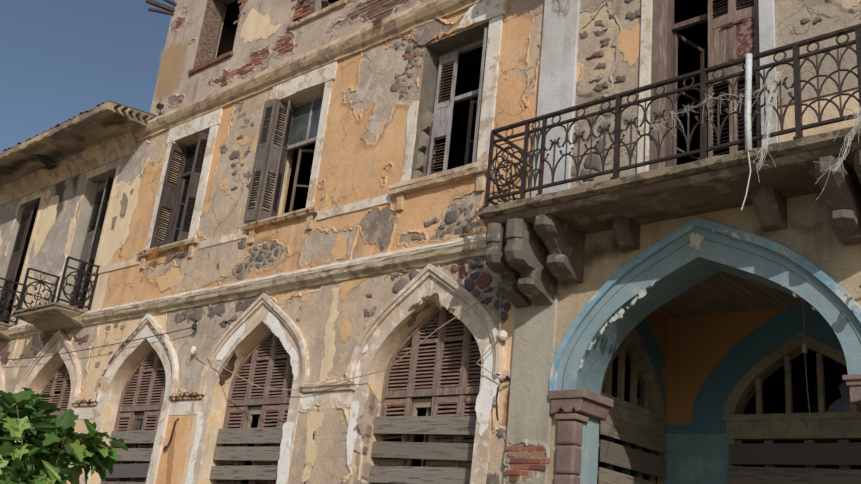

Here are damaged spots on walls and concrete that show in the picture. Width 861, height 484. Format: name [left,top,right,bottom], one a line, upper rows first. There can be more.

flaking render [208,0,310,88]
peeling [341,13,466,147]
spalling [805,0,861,14]
peeling [142,88,485,295]
peeling [689,228,806,265]
peeling [588,277,657,350]
peeling [0,323,124,393]
peeling [164,256,515,484]
flaking render [475,344,550,484]